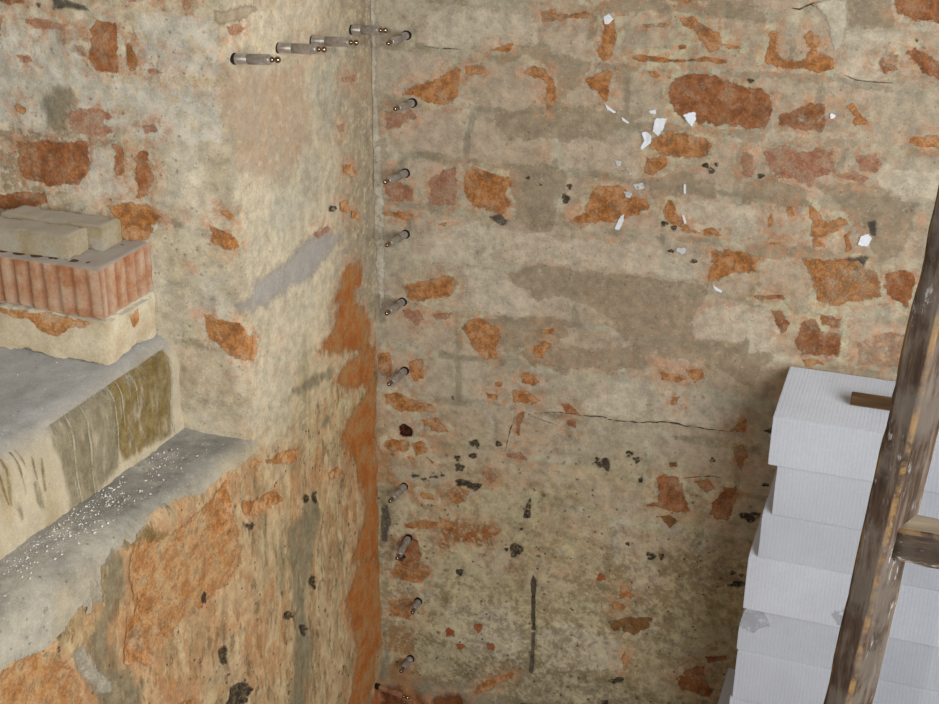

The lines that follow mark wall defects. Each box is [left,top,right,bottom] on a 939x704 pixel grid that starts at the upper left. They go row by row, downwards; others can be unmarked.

flaking render [894,0,939,23]
flaking render [76,19,138,74]
flaking render [402,63,485,105]
flaking render [633,16,834,175]
flaking render [0,108,161,241]
flaking render [429,166,512,214]
flaking render [204,314,257,361]
damp [51,351,176,508]
crack [506,412,722,446]
flaking render [647,462,690,528]
flaking render [124,480,283,667]
spalling [227,680,254,704]